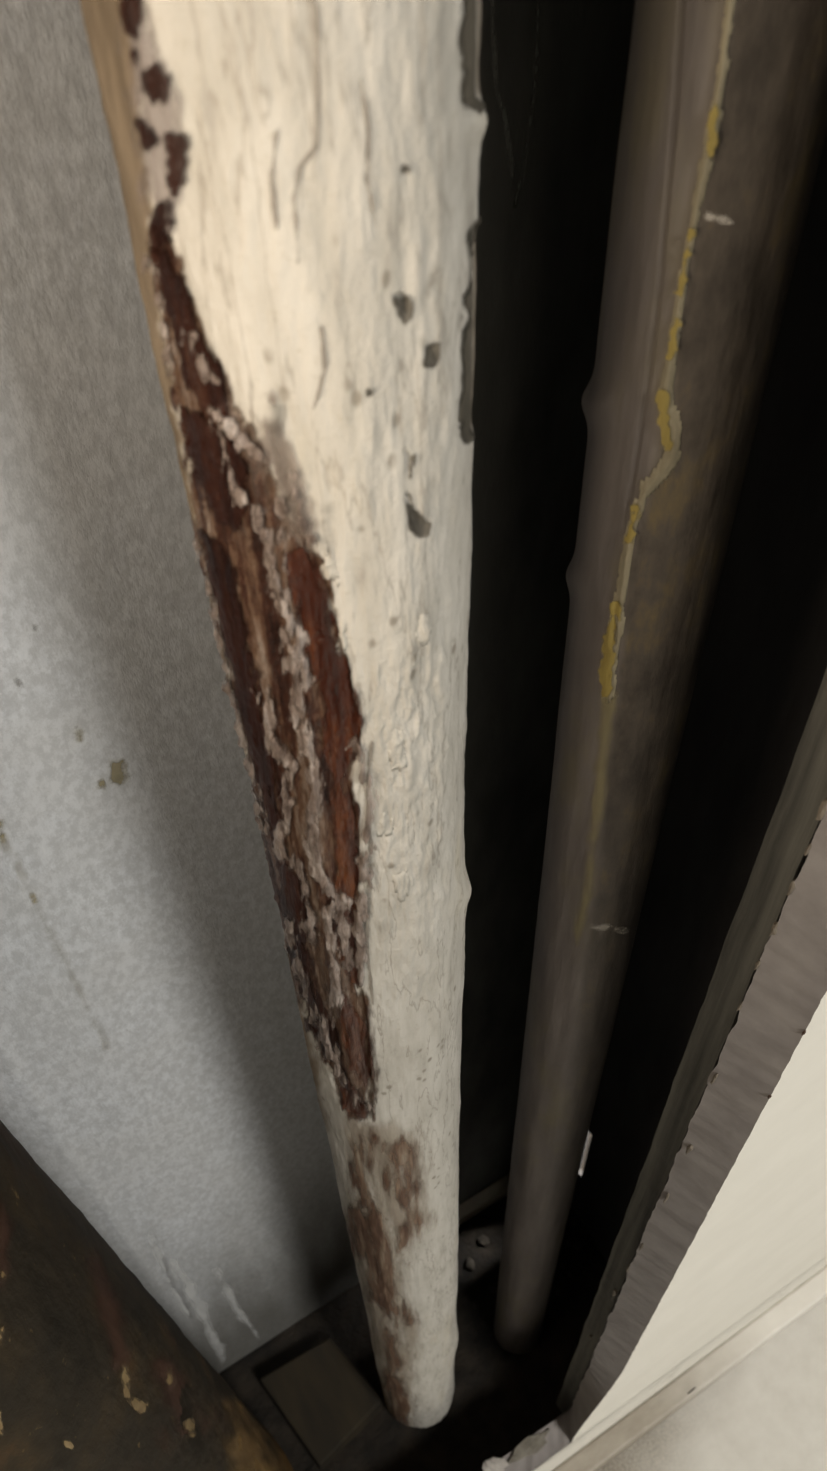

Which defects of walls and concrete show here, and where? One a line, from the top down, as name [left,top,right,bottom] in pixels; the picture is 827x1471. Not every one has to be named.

peeling [394,296,414,324]
peeling [459,217,481,445]
peeling [424,343,441,368]
peeling [407,454,432,538]
rust [119,0,423,1424]
peeling [122,1367,148,1414]
peeling [185,1419,195,1438]